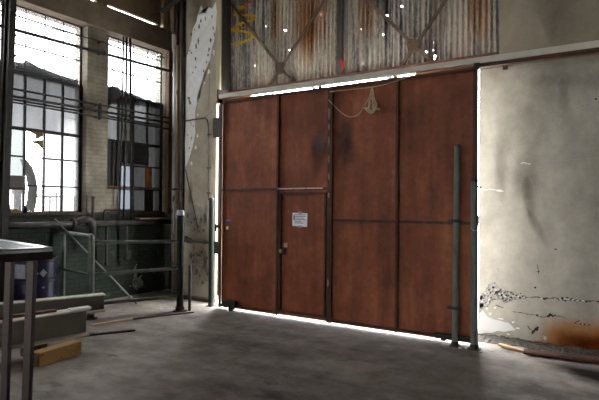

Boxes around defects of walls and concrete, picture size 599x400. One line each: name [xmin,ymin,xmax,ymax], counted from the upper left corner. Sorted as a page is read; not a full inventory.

spalling [479,283,527,335]